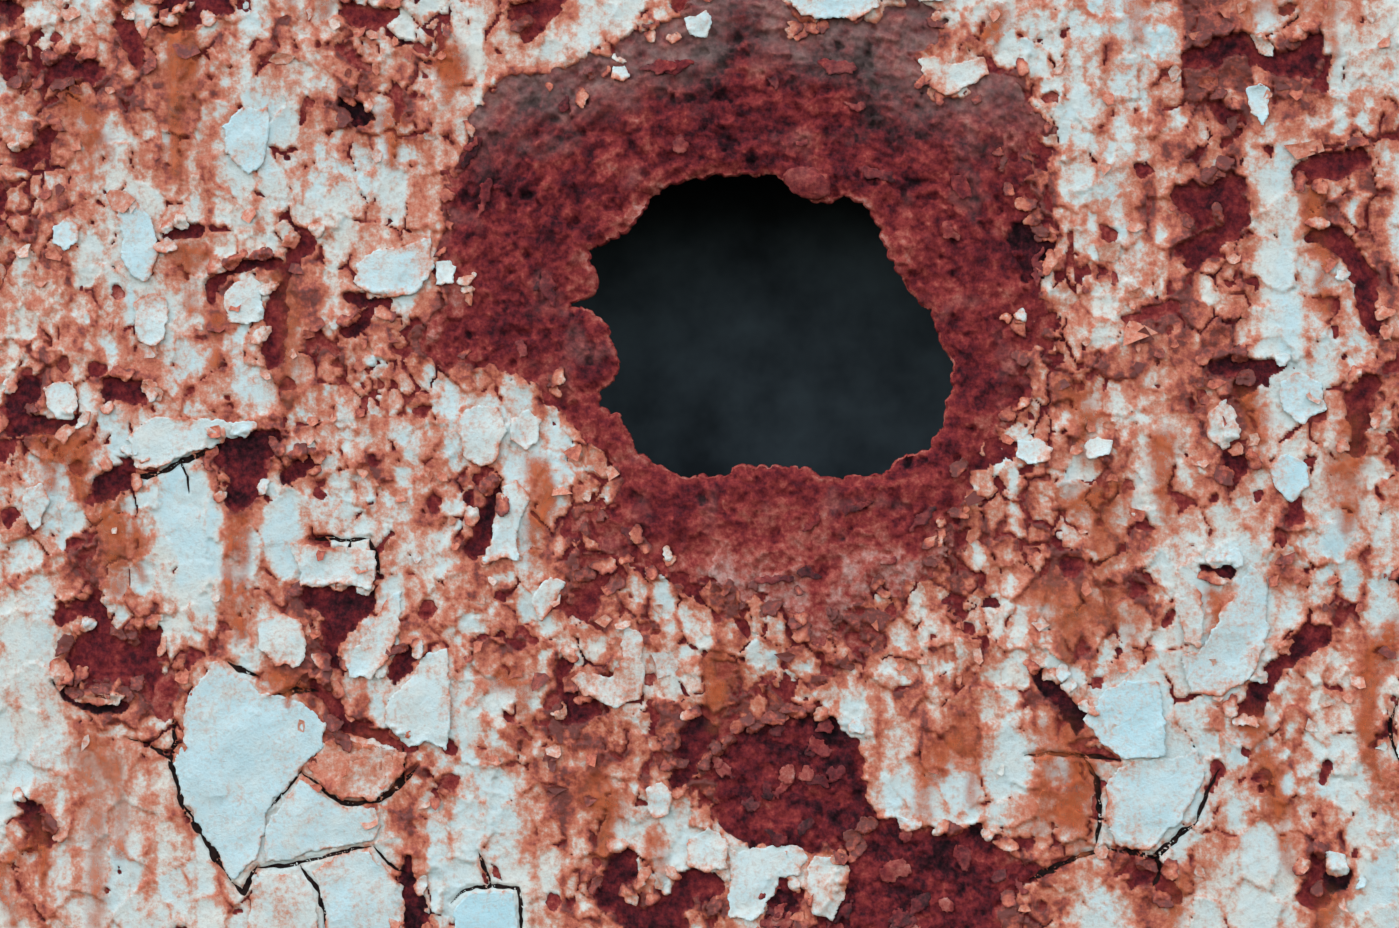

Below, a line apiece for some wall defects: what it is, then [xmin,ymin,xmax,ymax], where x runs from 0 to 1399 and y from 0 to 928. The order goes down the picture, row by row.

rust [412,23,467,102]
rust [1041,92,1059,102]
rust [111,285,125,300]
peeling [0,189,337,534]
peeling [195,222,477,380]
spalling [571,174,954,481]
peeling [49,540,483,928]
crack [227,661,318,697]
crack [128,719,418,924]
crack [451,852,523,928]
rust [699,703,1120,928]
crack [1024,751,1220,886]